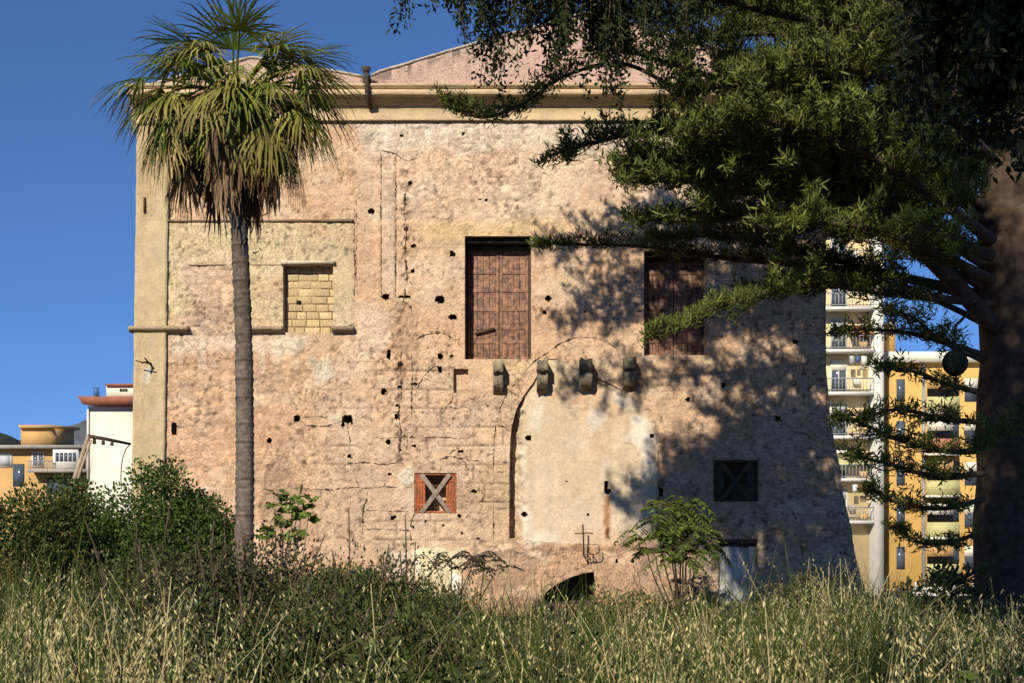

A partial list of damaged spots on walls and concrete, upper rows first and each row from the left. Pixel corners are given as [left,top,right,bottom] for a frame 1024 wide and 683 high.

crack [303,150,617,541]
corrosion [602,494,614,541]